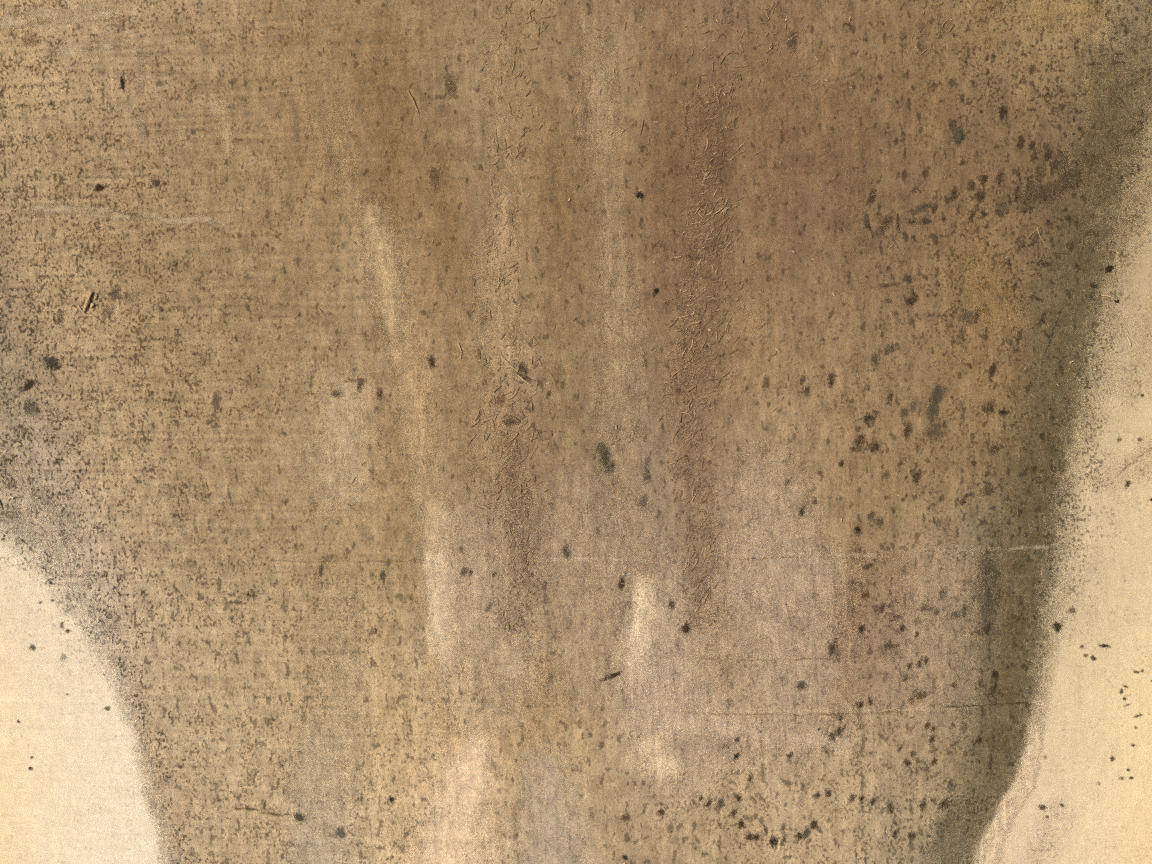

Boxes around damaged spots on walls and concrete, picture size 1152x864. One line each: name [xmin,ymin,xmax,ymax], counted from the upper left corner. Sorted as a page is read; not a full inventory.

leakage [0,10,148,144]
leakage [0,136,200,864]
leakage [88,209,230,227]
leakage [276,0,1106,864]